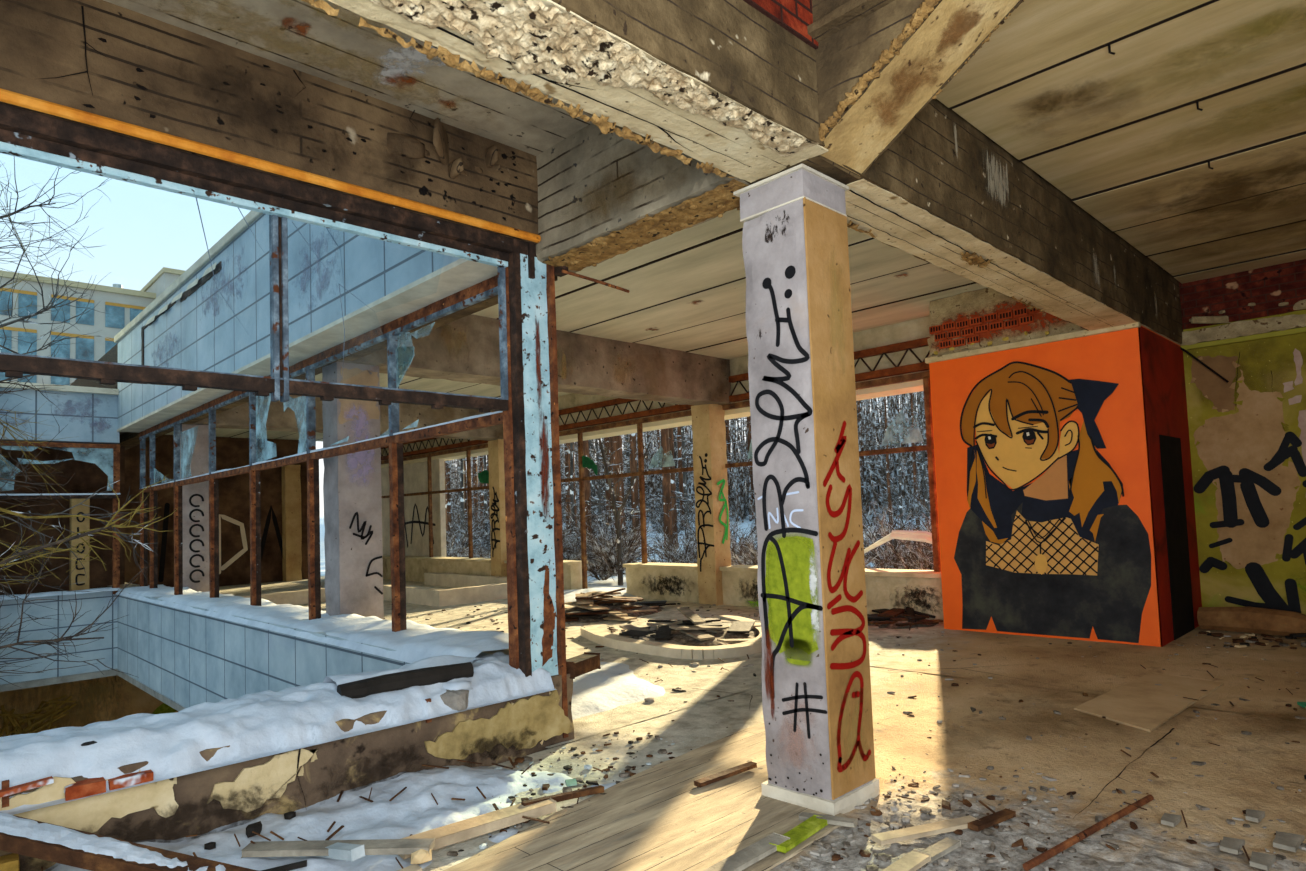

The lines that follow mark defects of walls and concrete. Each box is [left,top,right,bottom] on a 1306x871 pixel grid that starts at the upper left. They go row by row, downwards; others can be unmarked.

spalling [301,0,339,16]
spalling [359,0,940,271]
spalling [927,296,1050,356]
spalling [1189,310,1230,324]
spalling [1278,299,1306,310]
corrosion [536,320,549,517]
peeling [1190,349,1306,569]
flaking render [0,770,179,833]
flaking render [208,748,318,813]